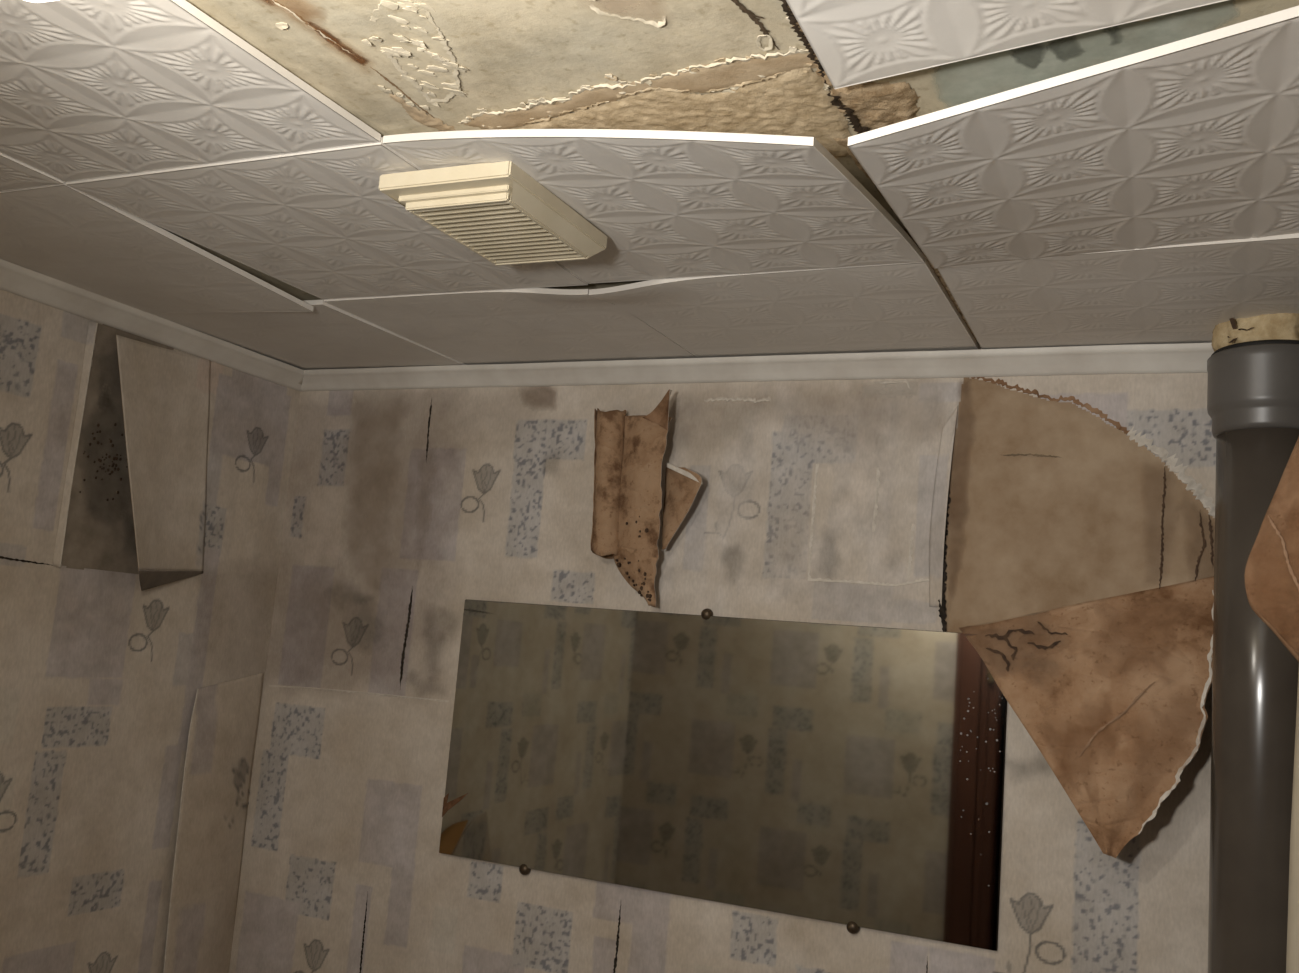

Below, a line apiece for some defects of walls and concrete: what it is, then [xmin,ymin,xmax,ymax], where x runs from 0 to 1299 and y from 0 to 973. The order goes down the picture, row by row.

crack [731,0,779,50]
spalling [362,0,920,211]
spalling [904,228,981,348]